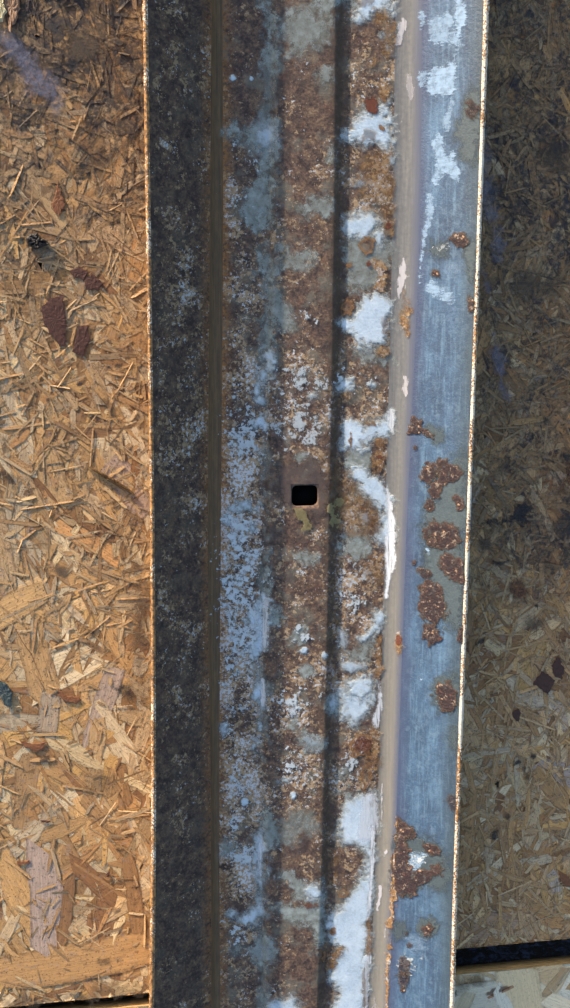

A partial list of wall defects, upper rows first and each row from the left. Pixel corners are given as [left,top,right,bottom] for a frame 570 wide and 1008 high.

rust [369,9,396,68]
rust [365,83,389,131]
rust [358,150,396,293]
rust [366,421,387,473]
rust [406,416,445,450]
rust [411,453,477,648]
rust [430,672,461,714]
rust [349,729,383,791]
rust [448,726,459,750]
rust [384,816,454,1008]
rust [320,927,343,969]